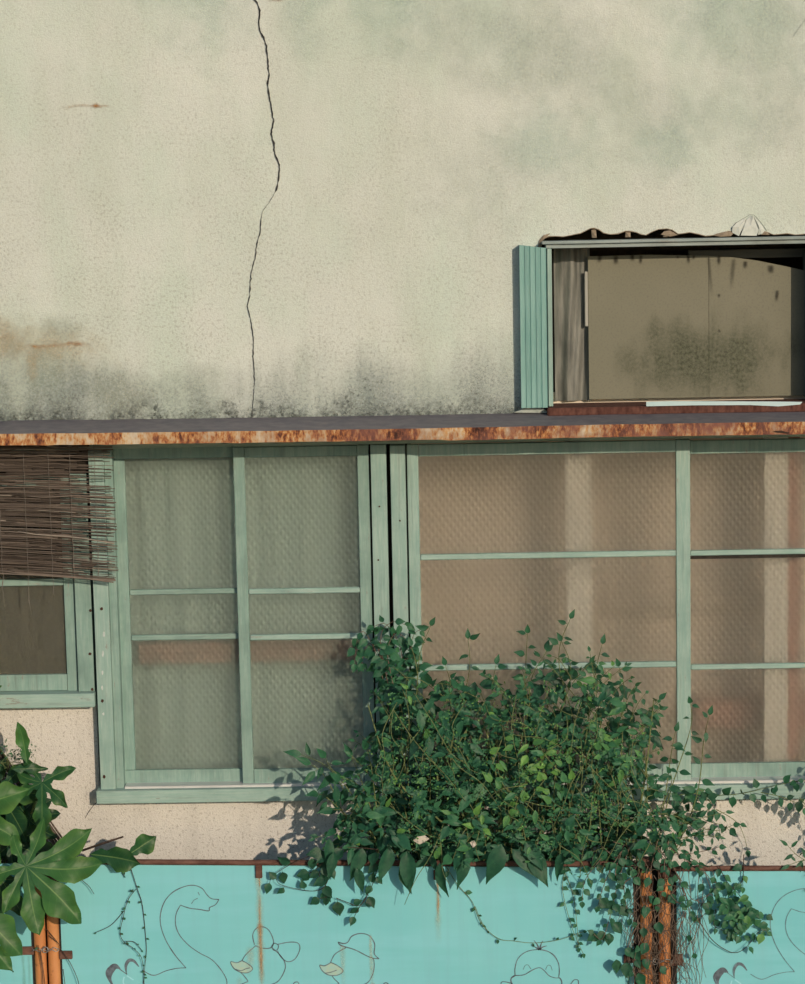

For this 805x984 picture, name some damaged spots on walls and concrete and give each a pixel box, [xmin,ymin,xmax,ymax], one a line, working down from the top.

crack [247,0,280,416]